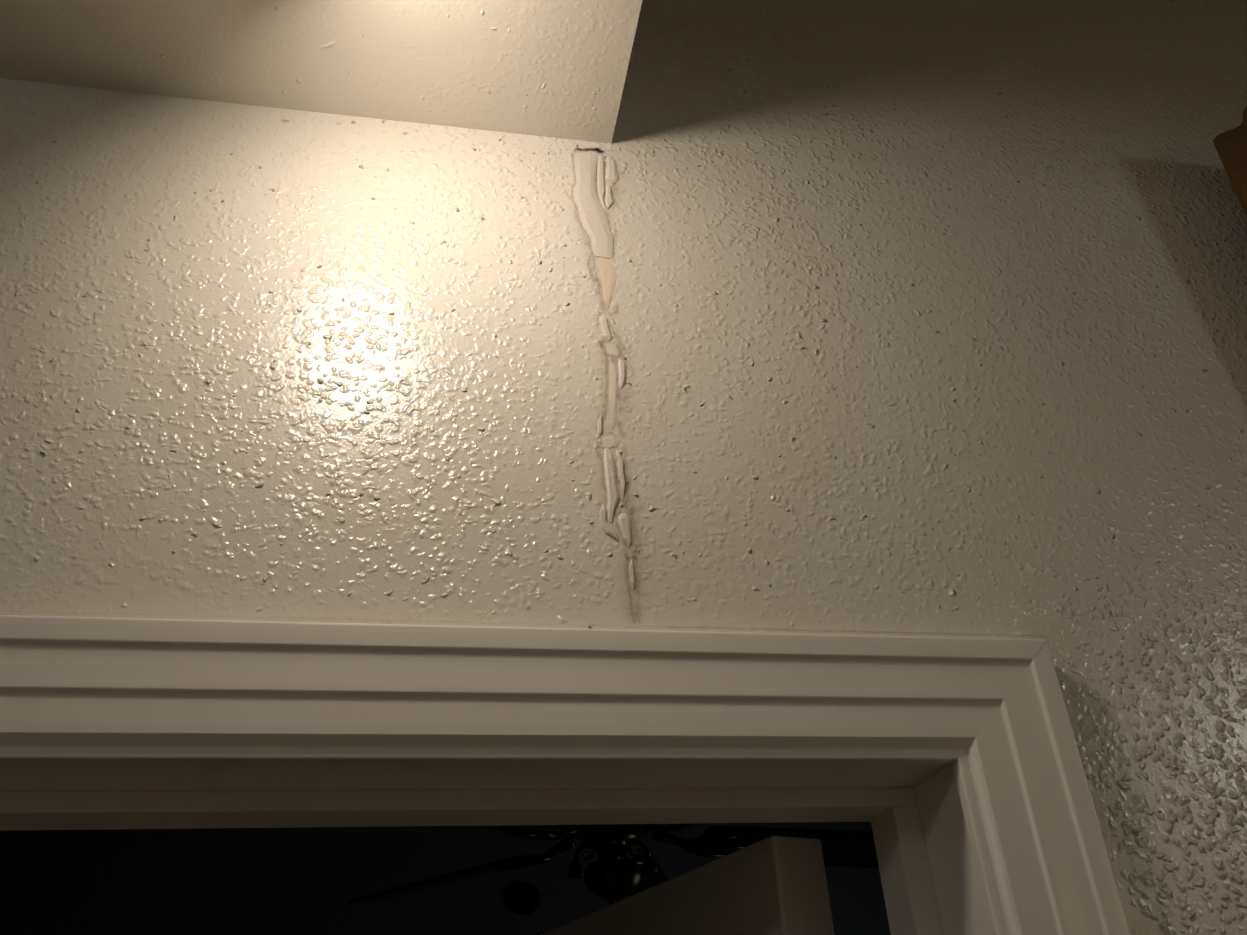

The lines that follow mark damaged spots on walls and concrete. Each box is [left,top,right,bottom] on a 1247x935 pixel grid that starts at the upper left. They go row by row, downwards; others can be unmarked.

crack [576,146,604,154]
peeling [572,153,635,590]